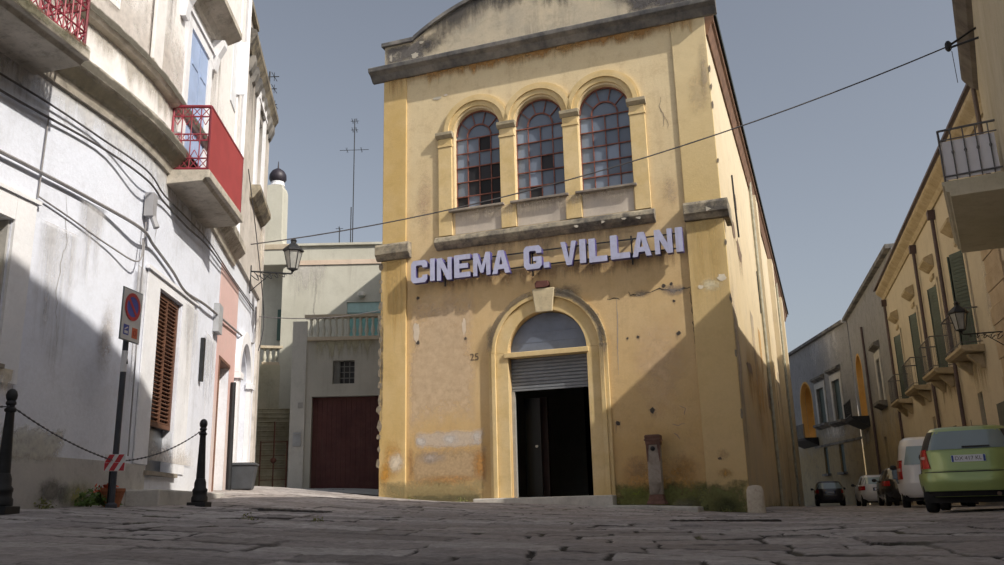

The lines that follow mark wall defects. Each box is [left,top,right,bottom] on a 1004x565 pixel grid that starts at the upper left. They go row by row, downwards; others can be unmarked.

leakage [435,0,510,26]
leakage [387,36,440,63]
leakage [426,26,656,77]
crack [608,287,695,375]
leakage [409,448,485,483]
leakage [663,466,748,512]